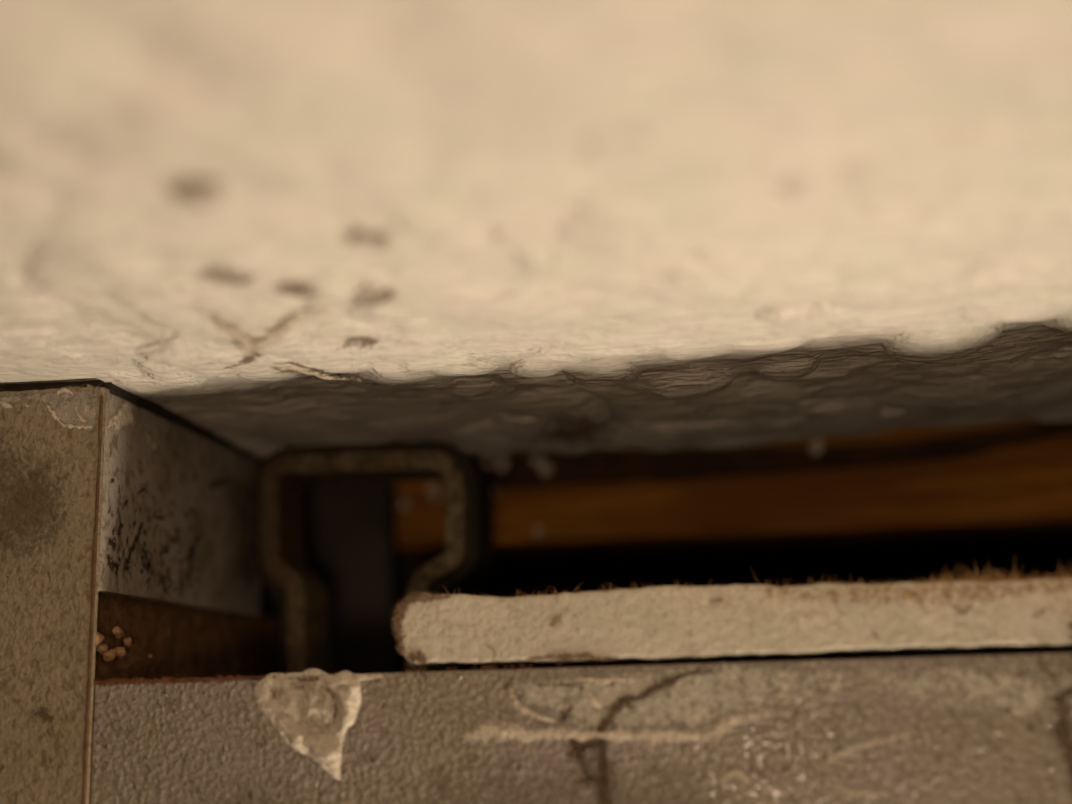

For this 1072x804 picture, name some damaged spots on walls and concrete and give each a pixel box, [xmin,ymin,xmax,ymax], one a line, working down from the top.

peeling [254,668,384,780]
crack [503,668,717,804]